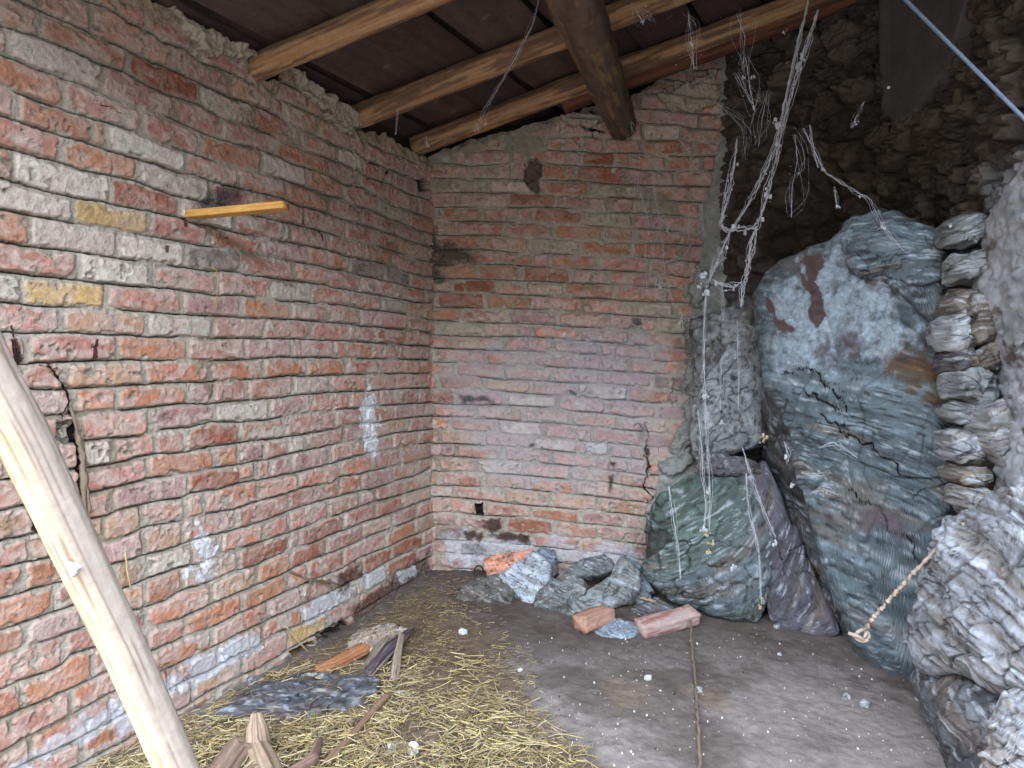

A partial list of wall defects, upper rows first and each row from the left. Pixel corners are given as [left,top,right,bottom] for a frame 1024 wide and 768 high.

crack [39,365,81,496]
damp [358,379,382,458]
crack [634,422,659,505]
damp [181,522,220,584]
damp [445,518,534,568]
damp [549,535,638,564]